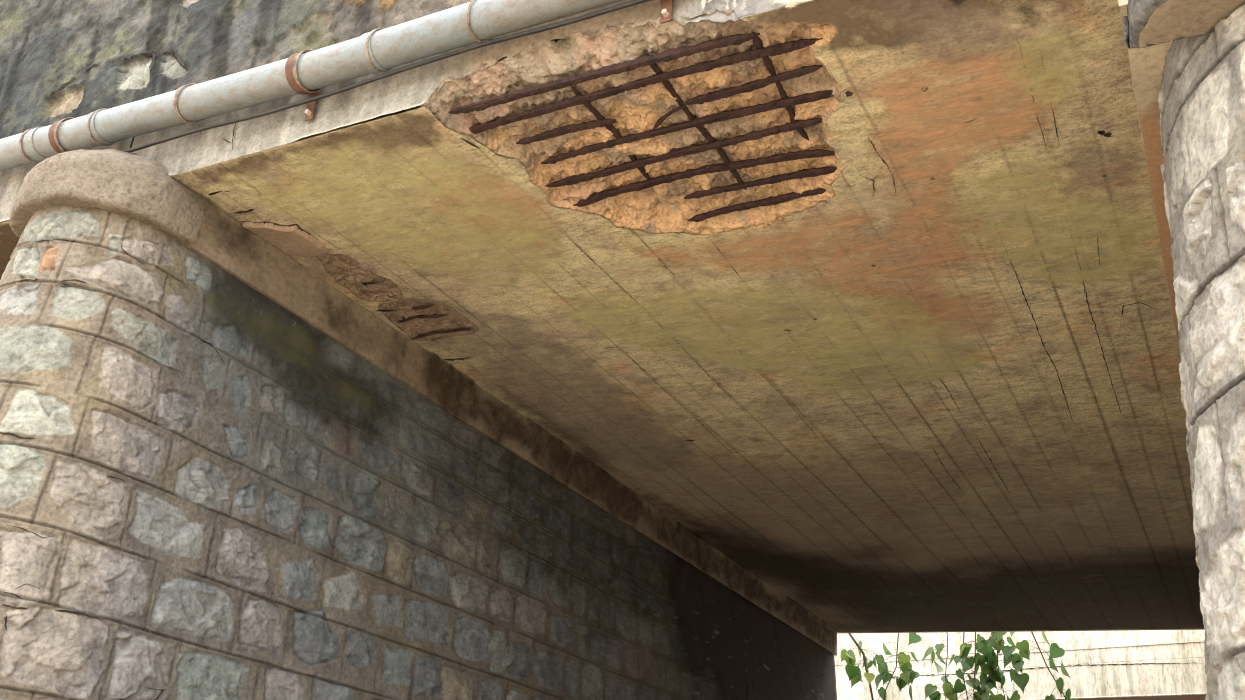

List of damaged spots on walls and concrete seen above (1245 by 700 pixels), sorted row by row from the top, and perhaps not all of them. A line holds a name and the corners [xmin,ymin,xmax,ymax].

spalling [419,9,853,235]
crack [860,133,896,199]
water stain [757,0,1005,49]
crack [1018,42,1060,149]
spalling [316,254,479,342]
crack [994,222,1075,424]
crack [1069,227,1153,417]
crack [920,347,1013,498]